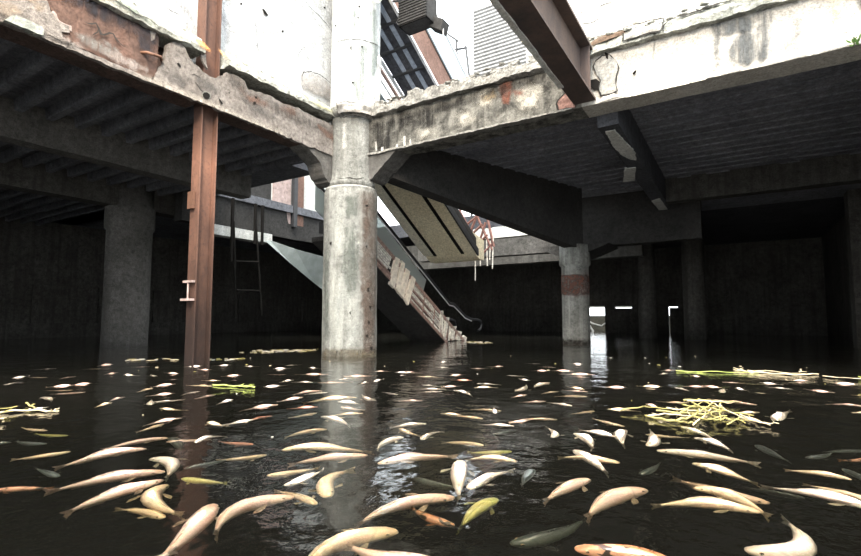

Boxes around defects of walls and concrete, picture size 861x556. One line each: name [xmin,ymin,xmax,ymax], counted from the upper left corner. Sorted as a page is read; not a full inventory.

spalling [47,0,163,79]
peeling [585,11,660,59]
crack [593,0,732,96]
damp [711,10,768,65]